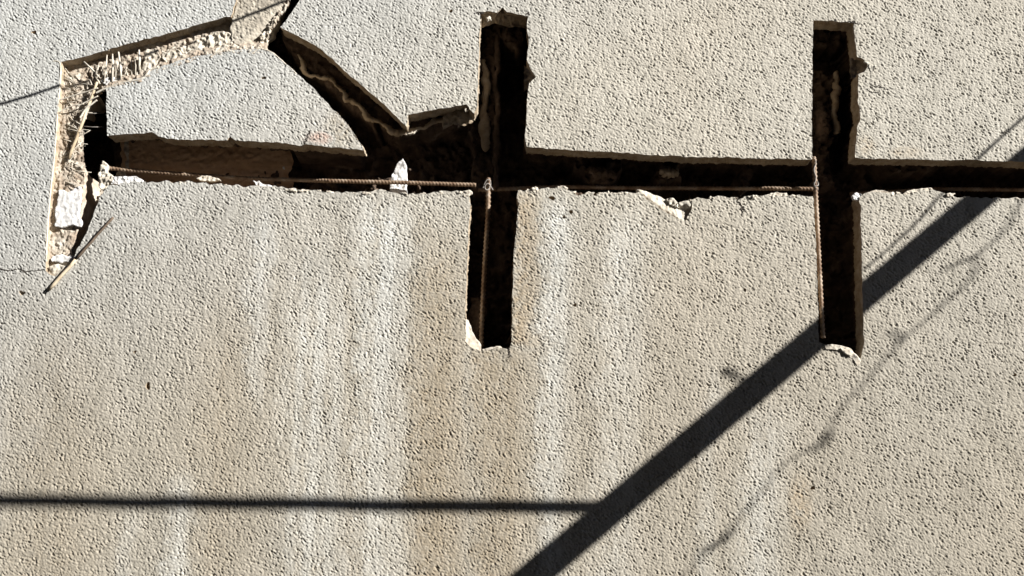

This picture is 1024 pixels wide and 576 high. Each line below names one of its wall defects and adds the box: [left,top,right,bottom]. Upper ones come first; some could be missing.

flaking render [849,58,876,79]
flaking render [45,0,861,366]
rust [512,189,548,350]
spalling [884,187,1024,200]